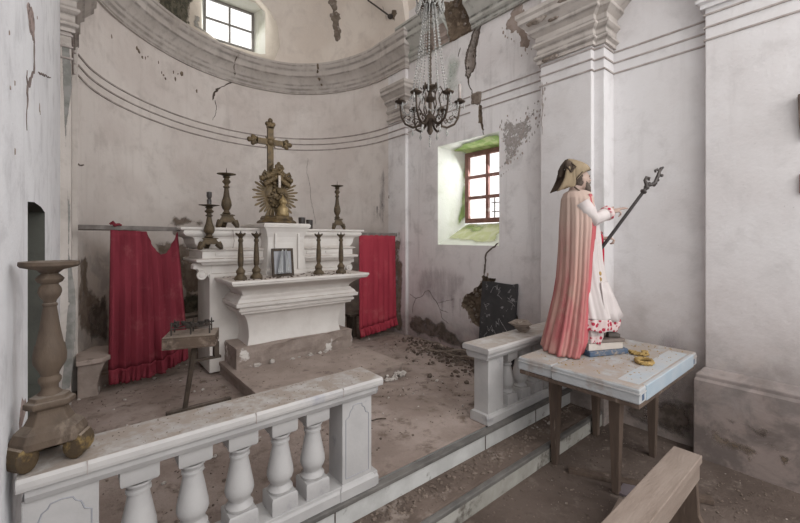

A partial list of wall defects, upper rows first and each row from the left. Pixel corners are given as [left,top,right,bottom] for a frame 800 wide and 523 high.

flaking render [26,2,38,40]
flaking render [328,0,341,42]
flaking render [502,4,559,57]
crack [212,54,239,117]
peeling [499,82,547,177]
crack [483,243,498,275]
damp [88,297,108,340]
damp [395,240,466,350]
flaking render [461,273,496,327]